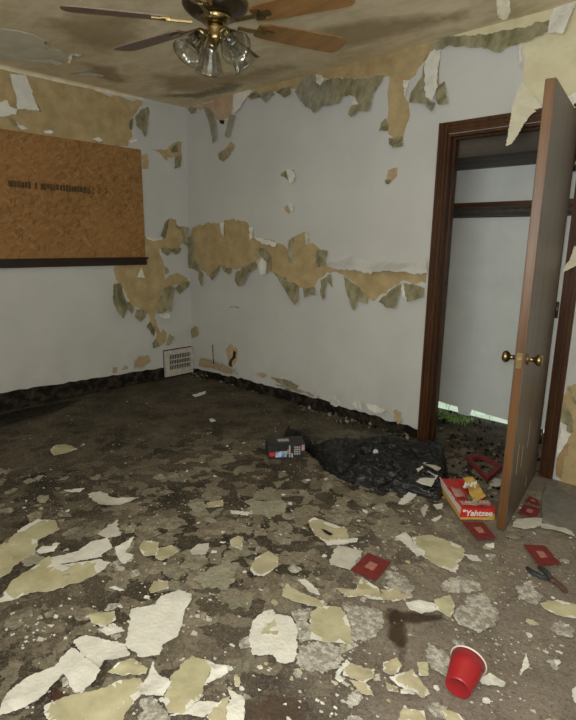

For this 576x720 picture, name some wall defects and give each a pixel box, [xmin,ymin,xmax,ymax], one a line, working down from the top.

peeling [497,0,511,20]
spalling [225,343,238,369]